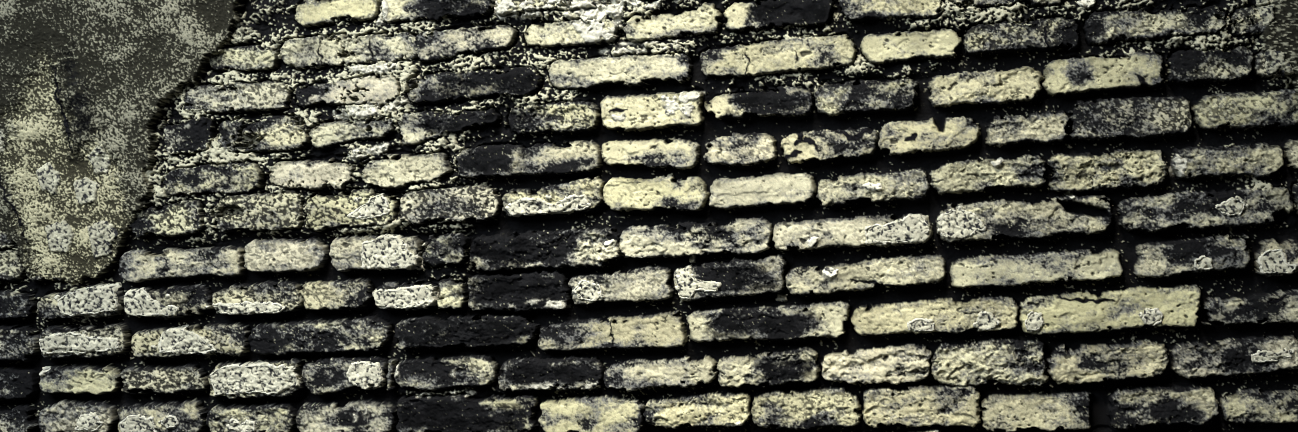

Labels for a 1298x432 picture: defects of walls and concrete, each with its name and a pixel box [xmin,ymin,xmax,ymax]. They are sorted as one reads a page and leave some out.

spalling [505,194,592,217]
spalling [1215,196,1250,217]
spalling [864,206,987,246]
spalling [361,234,440,309]
spalling [572,279,605,301]
spalling [675,255,722,300]
spalling [1194,255,1213,271]
spalling [1255,249,1298,274]
spalling [973,311,1001,332]
spalling [39,282,302,397]
spalling [346,361,387,390]
spalling [119,414,178,432]